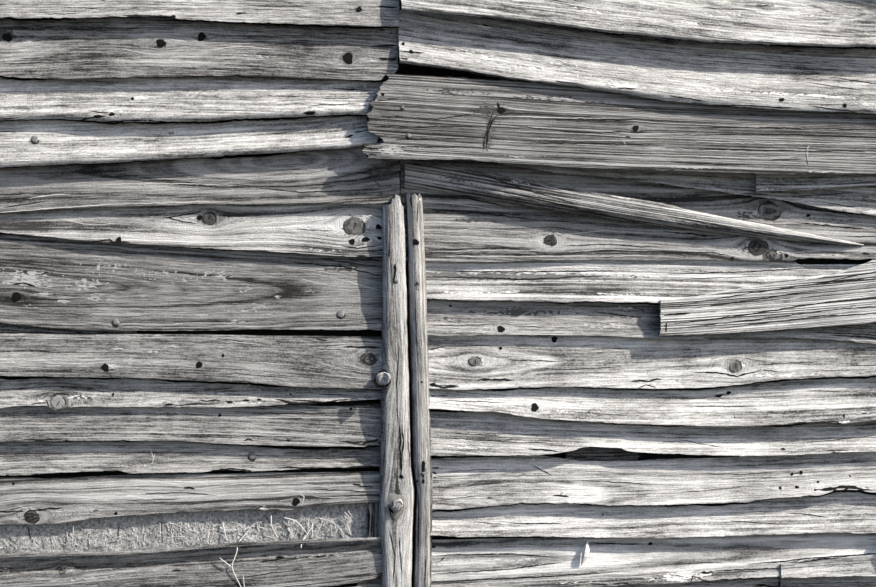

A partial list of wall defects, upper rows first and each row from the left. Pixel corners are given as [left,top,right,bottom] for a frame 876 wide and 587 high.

crack [256,186,357,194]
crack [300,218,397,280]
crack [410,172,876,339]
crack [694,360,817,407]
crack [176,398,220,406]
crack [229,298,641,587]
crack [788,421,873,451]
crack [680,472,768,493]
crack [817,475,871,492]
crack [730,513,840,525]
crack [583,527,653,545]
crack [663,539,876,587]